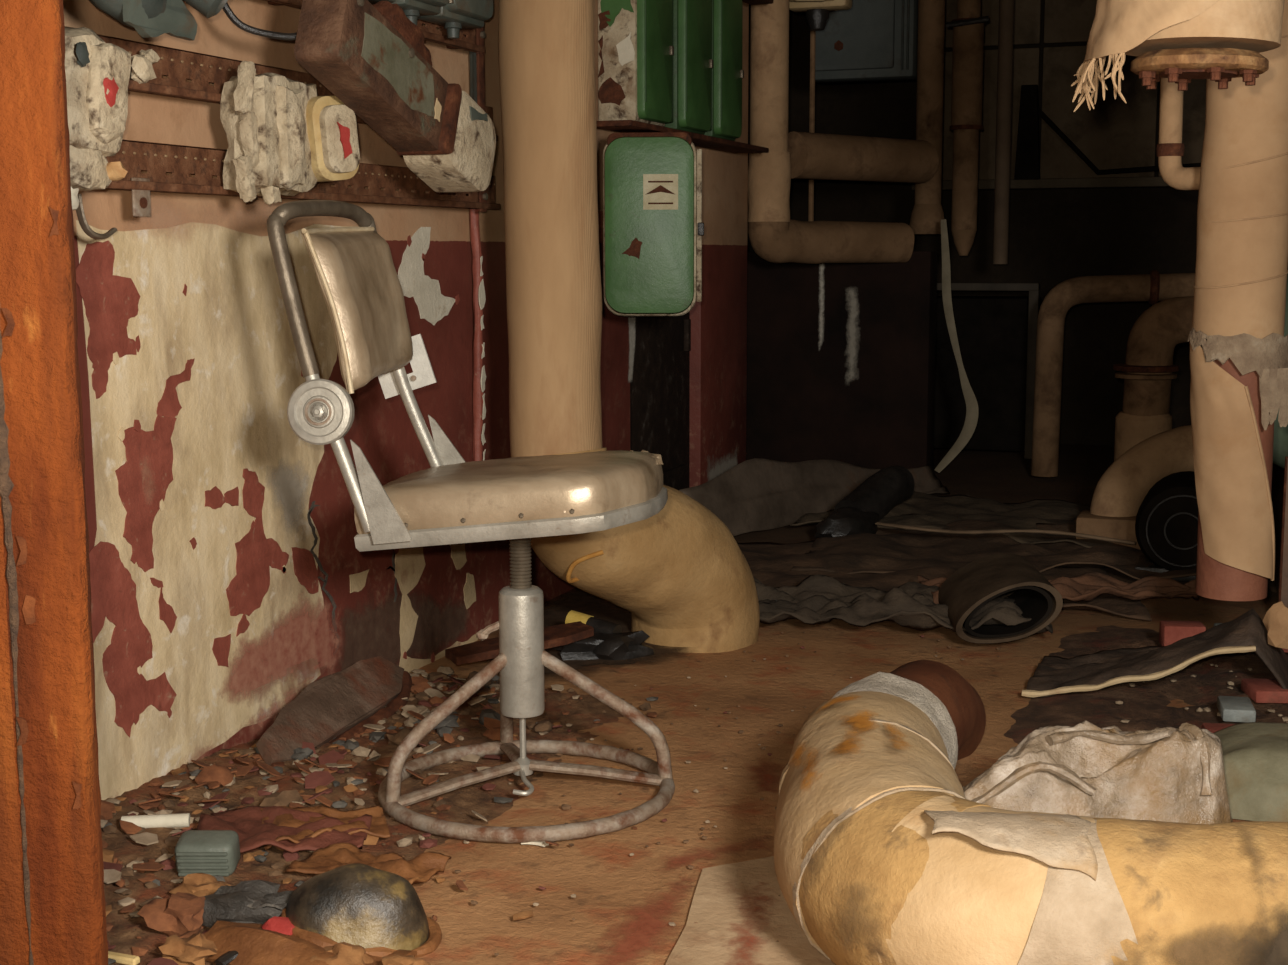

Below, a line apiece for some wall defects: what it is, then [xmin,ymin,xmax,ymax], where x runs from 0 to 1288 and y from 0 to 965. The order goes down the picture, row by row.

peeling [398,227,460,325]
peeling [76,220,356,800]
corrosion [22,595,36,624]
peeling [349,570,369,593]
peeling [394,544,478,673]